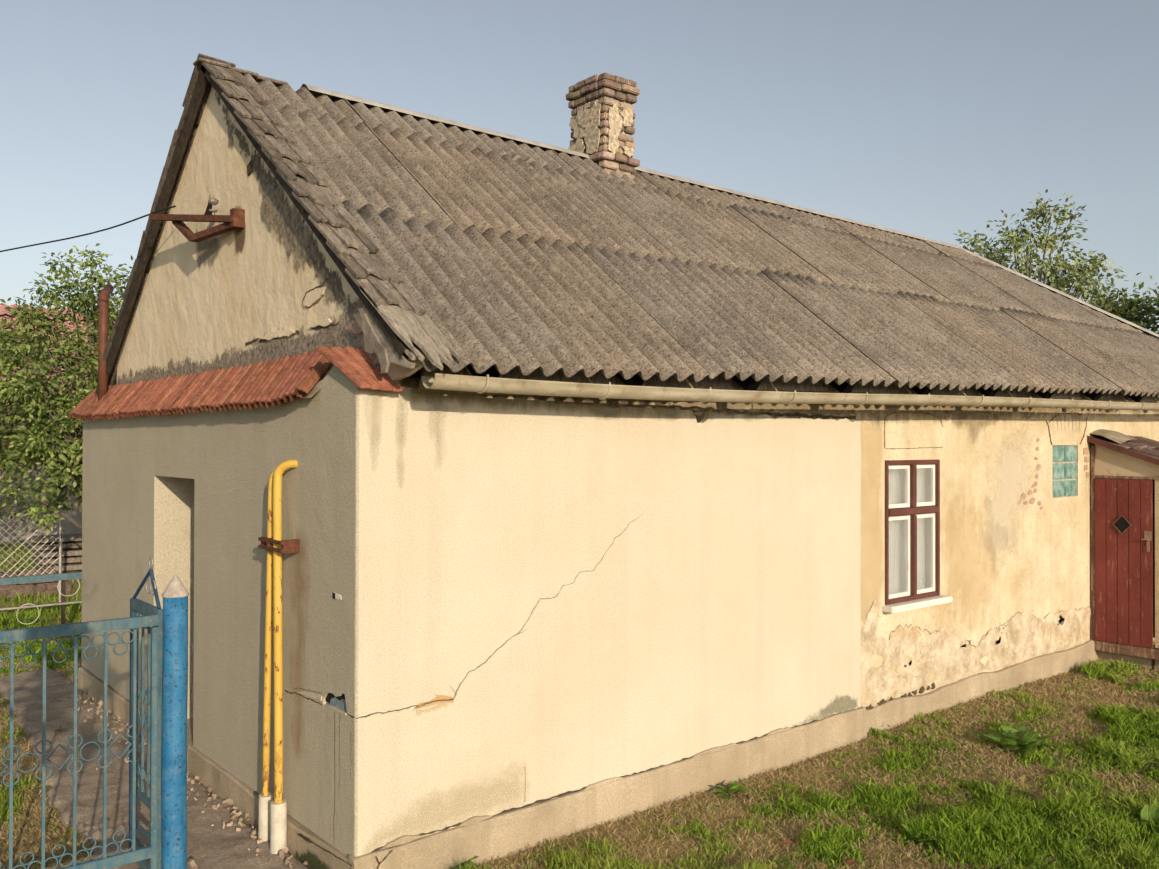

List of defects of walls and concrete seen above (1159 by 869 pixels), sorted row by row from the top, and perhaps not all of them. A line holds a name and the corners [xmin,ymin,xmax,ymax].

rust [234,223,245,251]
flaking render [302,278,328,308]
water stain [403,372,1116,434]
crack [334,511,645,816]
flaking render [860,599,1091,710]
spalling [285,688,354,718]